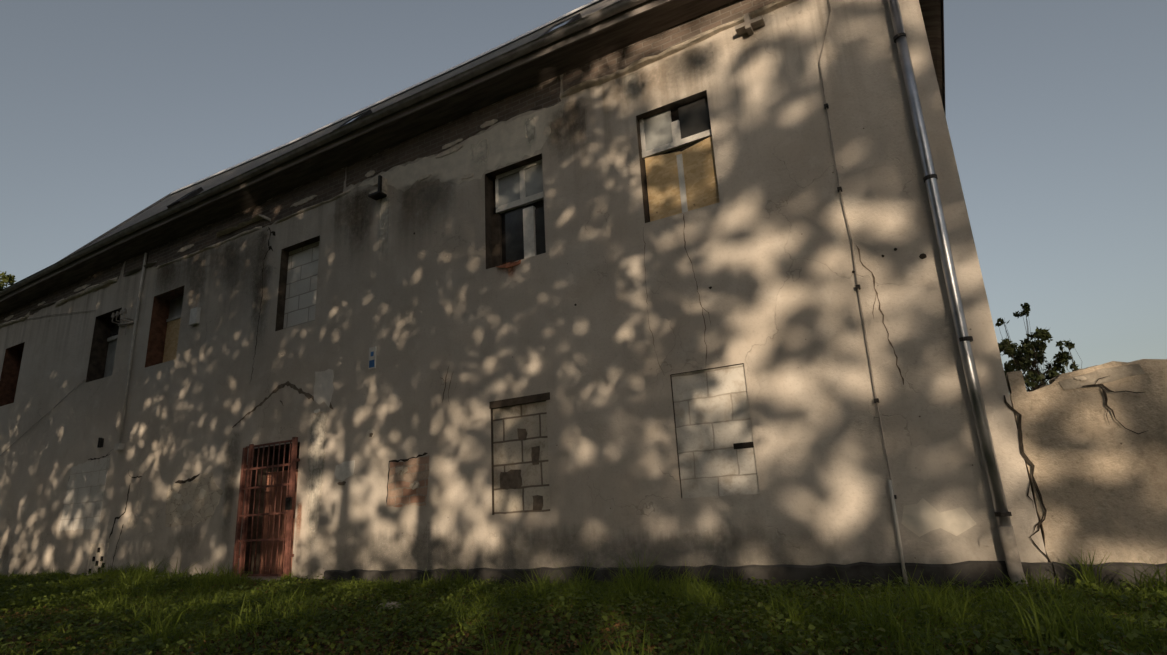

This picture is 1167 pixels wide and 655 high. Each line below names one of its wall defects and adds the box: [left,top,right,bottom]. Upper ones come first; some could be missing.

flaking render [123,0,776,277]
crack [232,227,333,428]
flaking render [386,455,430,507]
crack [683,214,711,359]
crack [1004,395,1052,563]
crack [1082,376,1146,434]